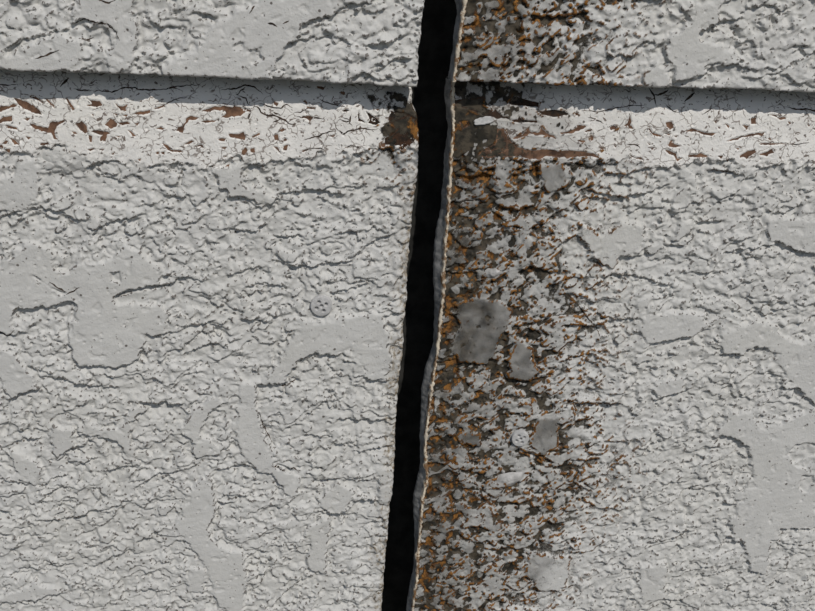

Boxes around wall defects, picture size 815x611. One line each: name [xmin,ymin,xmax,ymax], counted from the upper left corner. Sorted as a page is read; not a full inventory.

peeling [0,95,65,145]
peeling [72,104,165,155]
peeling [176,104,250,132]
peeling [219,132,260,167]
peeling [343,109,417,150]
corrosion [360,91,419,188]
peeling [455,96,604,160]
peeling [647,122,708,161]
peeling [729,118,786,159]
corrosion [414,0,645,611]